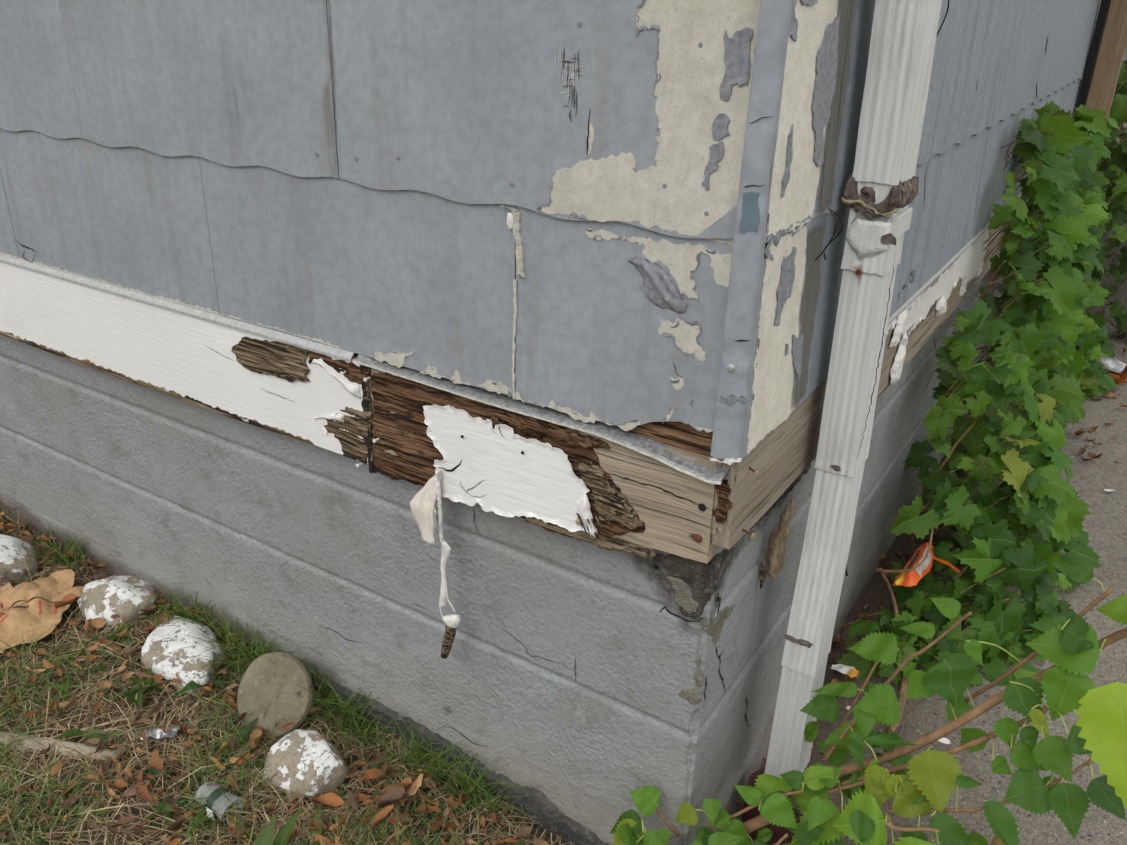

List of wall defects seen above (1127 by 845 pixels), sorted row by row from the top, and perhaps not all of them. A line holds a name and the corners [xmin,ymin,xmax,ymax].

peeling [537,0,842,465]
peeling [886,229,989,385]
peeling [312,361,361,399]
peeling [375,351,414,368]
peeling [420,363,642,431]
peeling [410,404,597,659]
spalling [749,464,811,530]
spalling [652,541,738,644]
spalling [679,658,703,705]
crack [659,593,749,727]